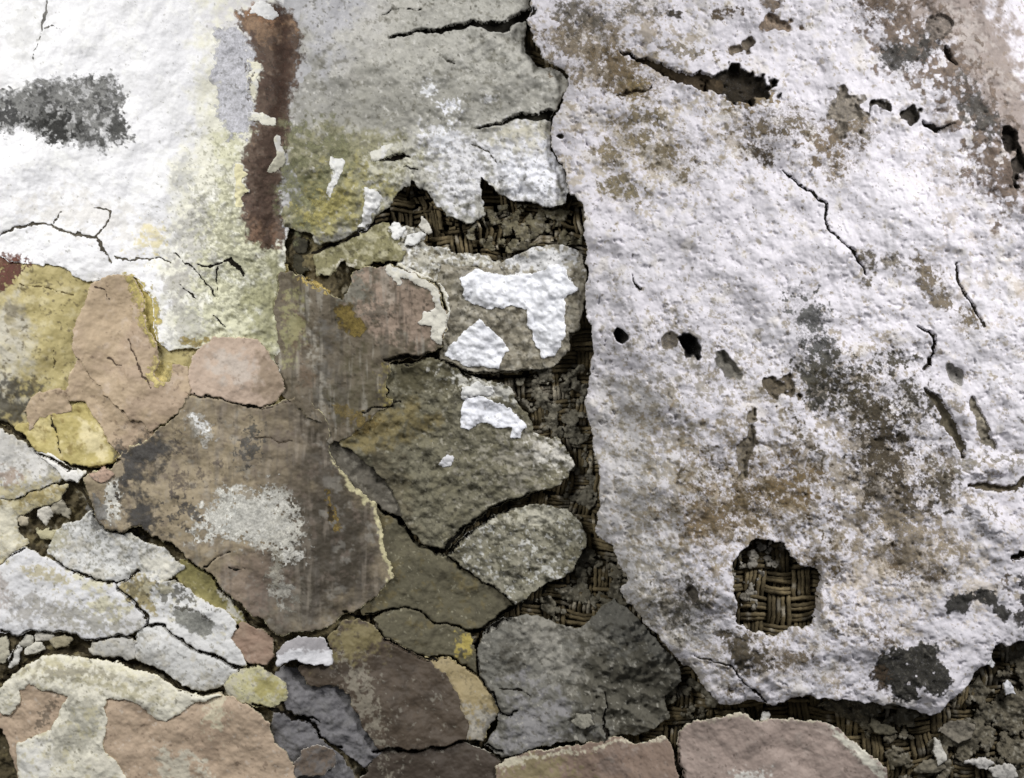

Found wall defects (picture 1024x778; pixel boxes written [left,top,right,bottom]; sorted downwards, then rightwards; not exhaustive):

crack [382,7,537,39]
leakage [0,69,135,156]
crack [0,207,245,327]
flaking render [388,216,432,246]
crack [784,172,865,274]
peeling [385,262,578,369]
crack [919,327,937,370]
peeling [460,381,527,439]
peeling [14,274,500,751]
leakage [650,573,814,698]
leakage [867,626,954,703]
flaking render [913,720,975,774]